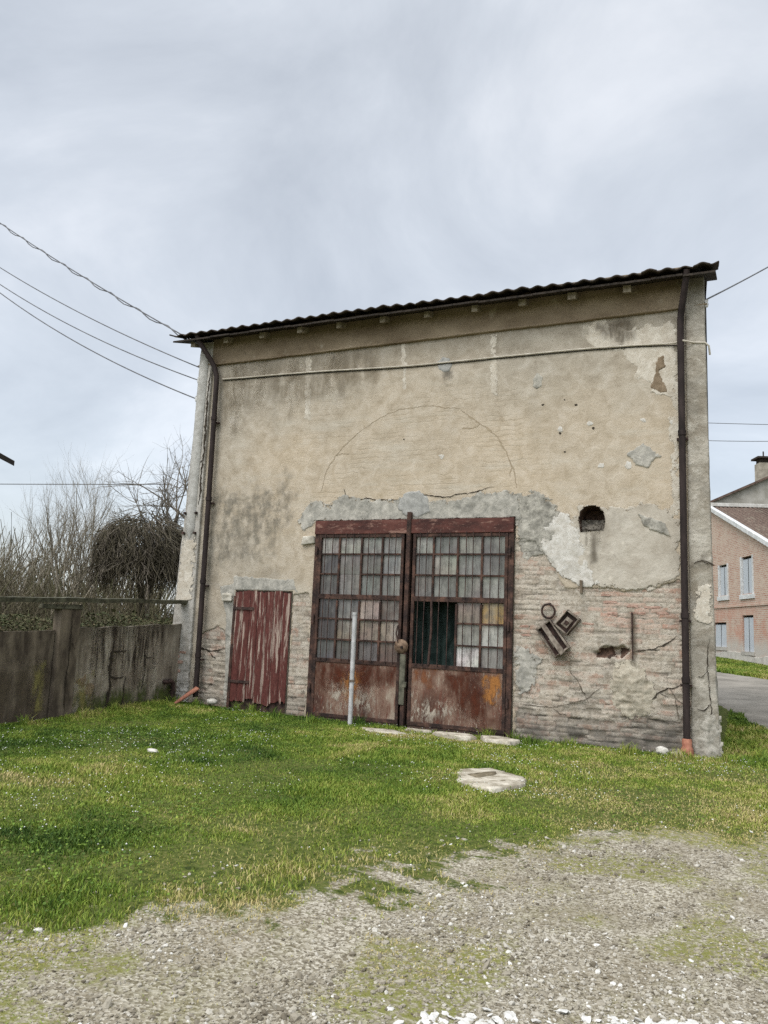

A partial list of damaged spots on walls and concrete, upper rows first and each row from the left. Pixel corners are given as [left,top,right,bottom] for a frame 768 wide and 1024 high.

peeling [582,319,687,517]
spalling [512,509,715,753]
corrosion [321,665,393,710]
corrosion [411,673,500,719]
crack [524,671,599,716]